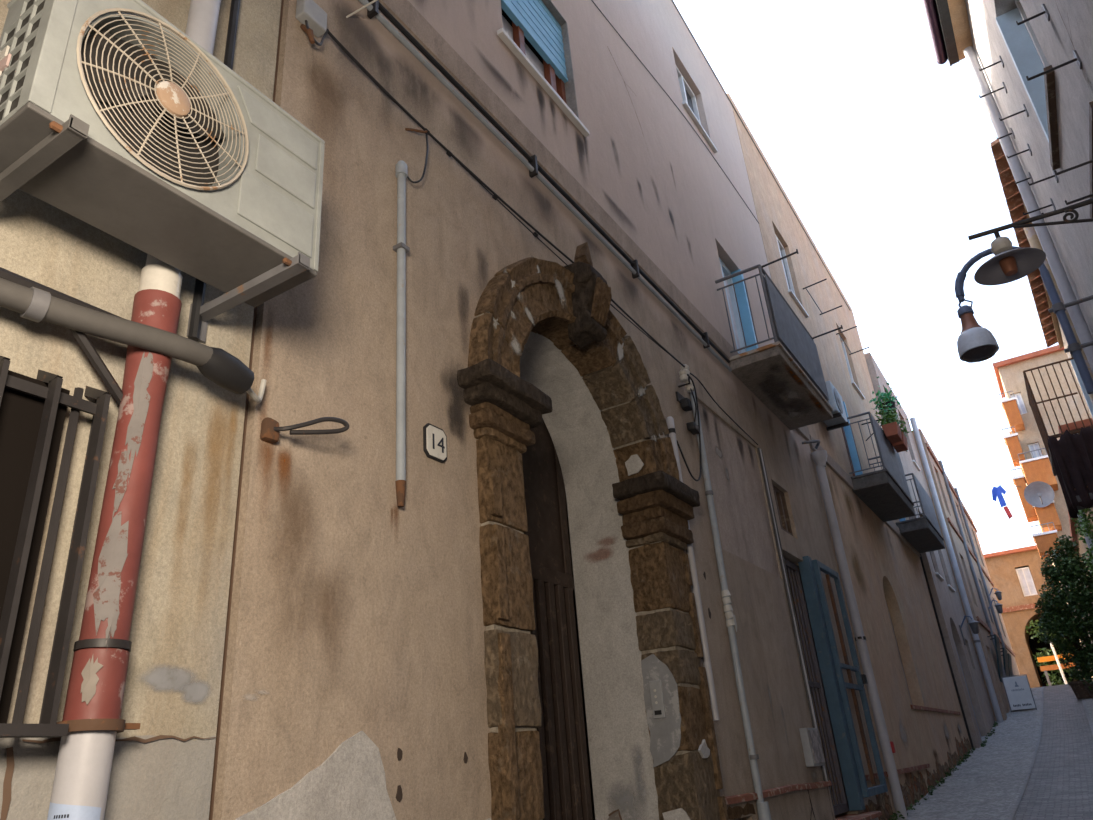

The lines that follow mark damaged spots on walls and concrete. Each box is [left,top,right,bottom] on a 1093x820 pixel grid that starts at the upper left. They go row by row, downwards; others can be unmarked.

corrosion [265,447,290,478]